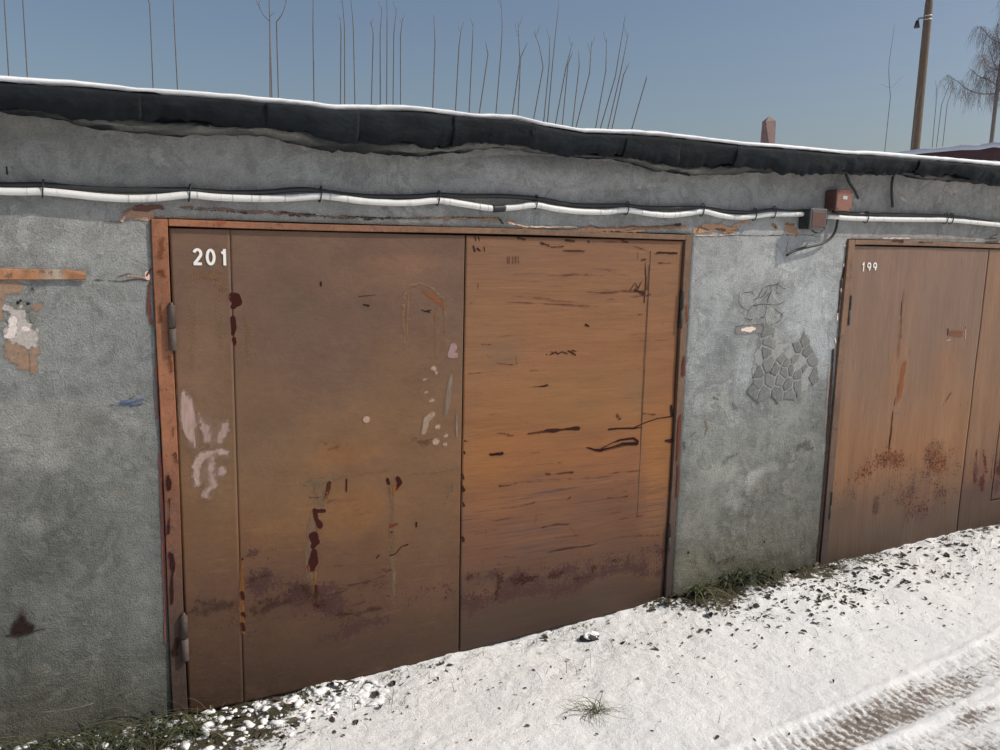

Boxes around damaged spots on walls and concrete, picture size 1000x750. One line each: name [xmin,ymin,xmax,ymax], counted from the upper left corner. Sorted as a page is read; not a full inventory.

spalling [0,281,42,374]
rust [845,361,955,521]
rust [239,481,381,633]